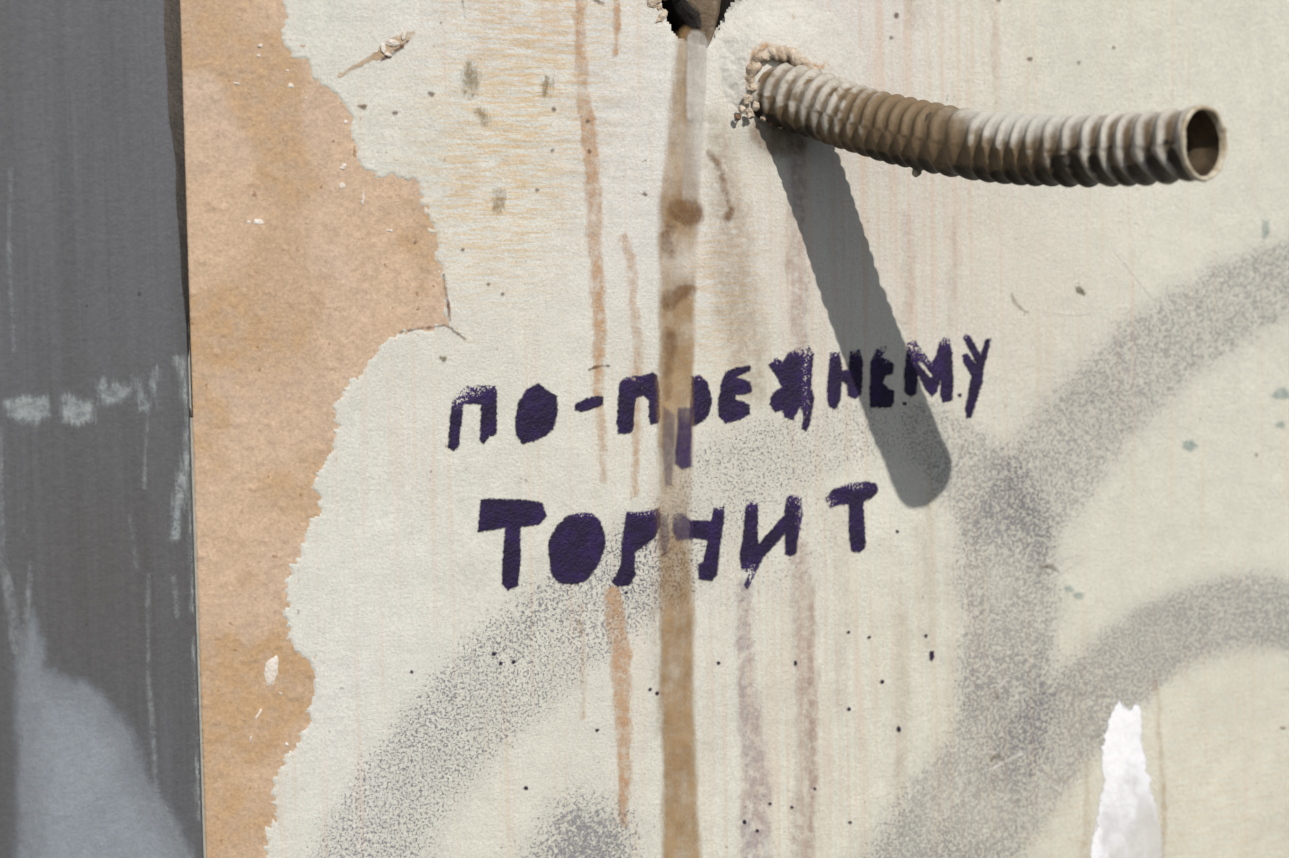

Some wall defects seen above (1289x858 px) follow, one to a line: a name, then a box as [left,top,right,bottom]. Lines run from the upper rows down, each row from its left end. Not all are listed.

spalling [646,0,685,41]
spalling [715,0,735,30]
corrosion [594,261,604,395]
peeling [17,0,459,858]
corrosion [607,588,630,823]